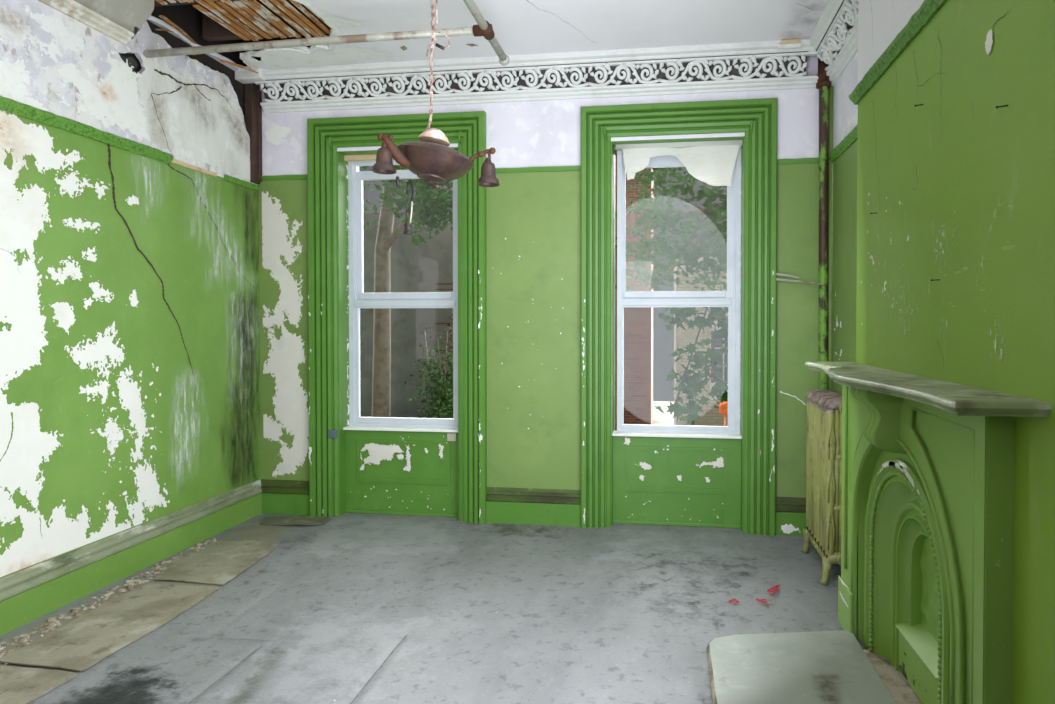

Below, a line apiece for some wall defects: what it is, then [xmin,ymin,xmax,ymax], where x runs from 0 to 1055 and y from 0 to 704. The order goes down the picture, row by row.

peeling [235,44,407,84]
crack [107,144,196,395]
peeling [0,8,322,577]
peeling [360,436,444,472]
peeling [696,448,724,483]